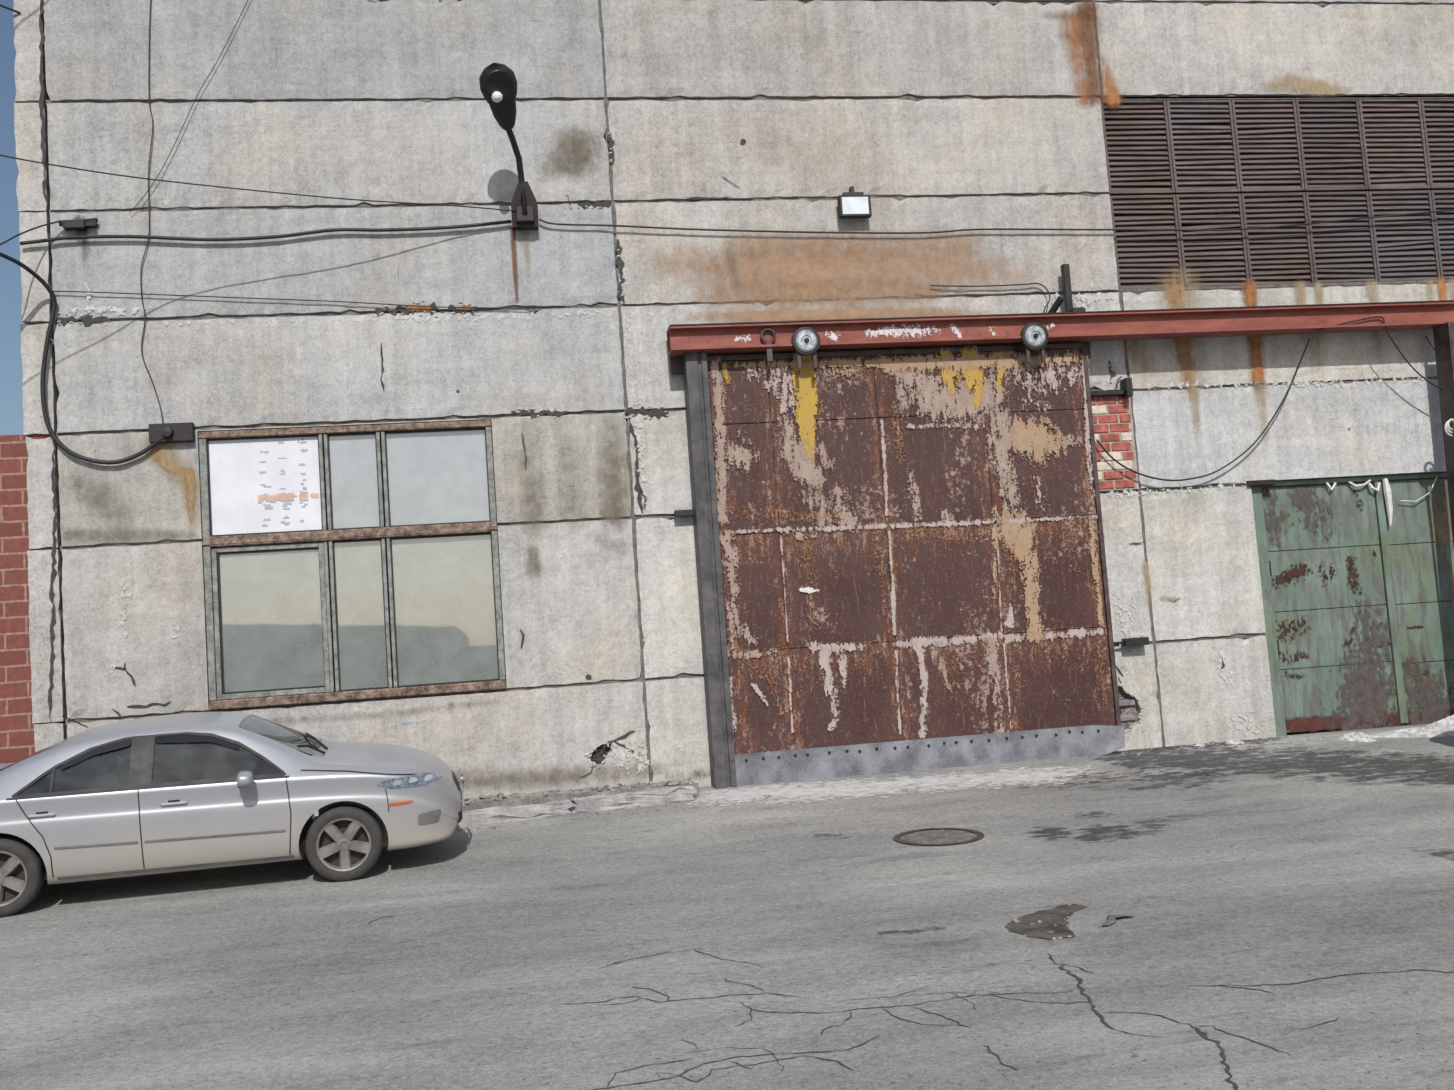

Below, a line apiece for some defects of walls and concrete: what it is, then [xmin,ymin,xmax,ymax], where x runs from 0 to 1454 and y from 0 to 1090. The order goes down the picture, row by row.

corrosion [1066,0,1120,105]
damp [554,131,590,171]
corrosion [1245,282,1256,306]
corrosion [1175,338,1198,416]
corrosion [1249,335,1265,417]
corrosion [147,443,195,520]
peeling [707,322,1454,739]
spalling [584,742,650,775]
damp [1044,743,1454,790]
corrosion [1285,709,1454,732]
crack [565,948,1339,1090]
crack [1187,969,1444,993]